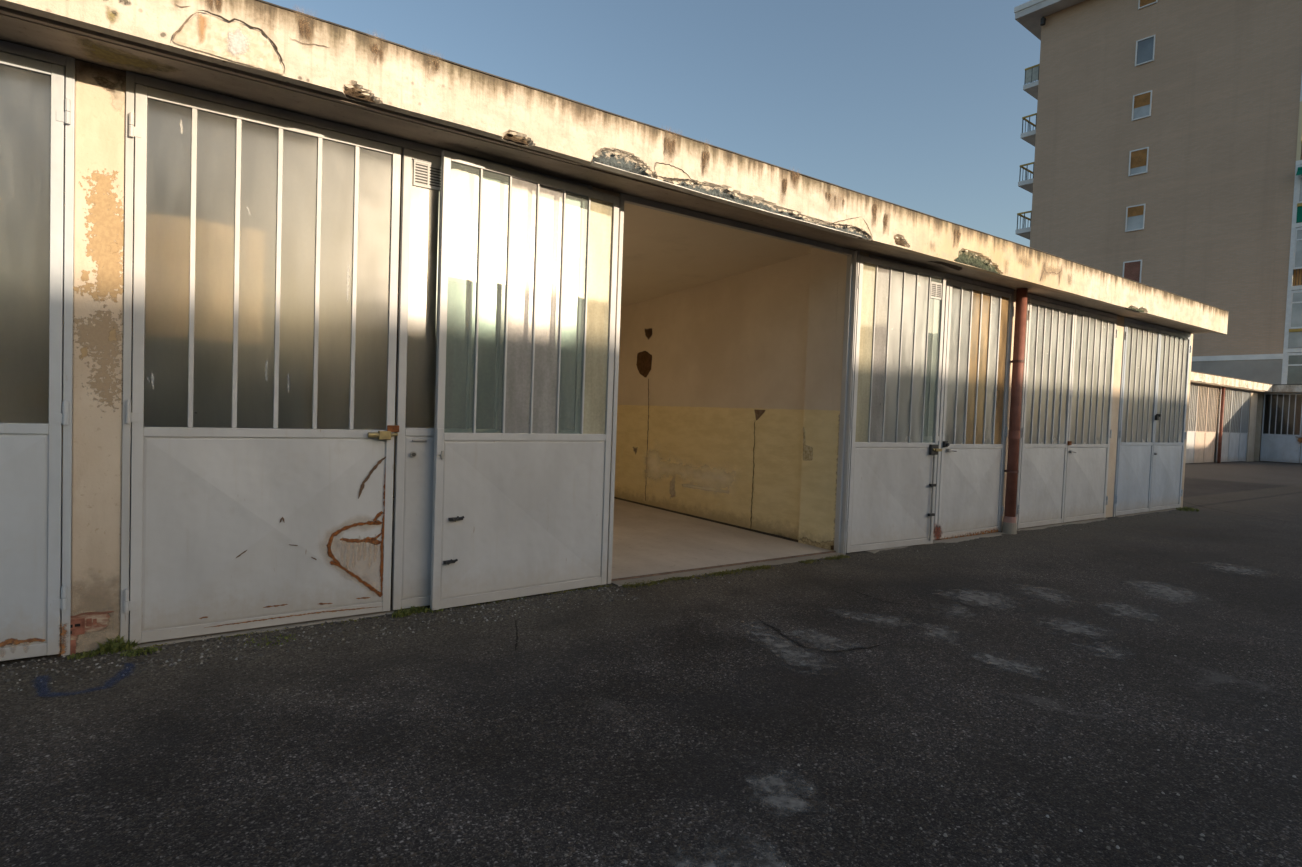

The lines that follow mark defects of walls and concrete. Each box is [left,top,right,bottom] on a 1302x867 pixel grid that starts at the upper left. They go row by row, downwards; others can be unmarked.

water stain [299,20,311,38]
water stain [79,61,126,110]
spalling [344,84,376,103]
water stain [664,137,675,153]
spalling [590,147,873,241]
spalling [929,250,1001,274]
peeling [73,168,134,412]
rust [199,456,386,628]
rust [0,624,67,654]